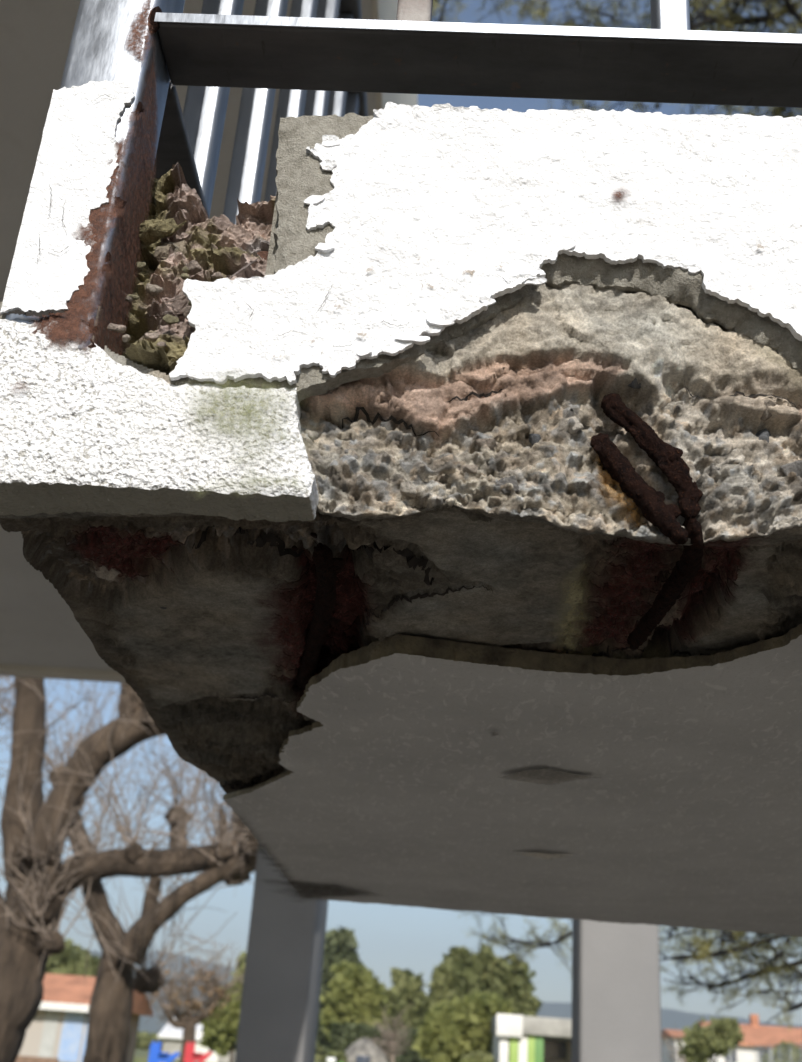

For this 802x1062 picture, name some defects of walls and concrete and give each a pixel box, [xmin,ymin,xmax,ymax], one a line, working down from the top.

rust [32,0,162,355]
peeling [304,195,325,205]
peeling [320,135,340,171]
spalling [104,162,276,384]
crack [327,407,439,436]
crack [448,387,507,402]
crack [684,380,799,408]
rust [72,525,179,579]
spalling [0,253,802,794]
crack [345,542,493,631]
rust [576,538,674,648]
rust [673,540,747,636]